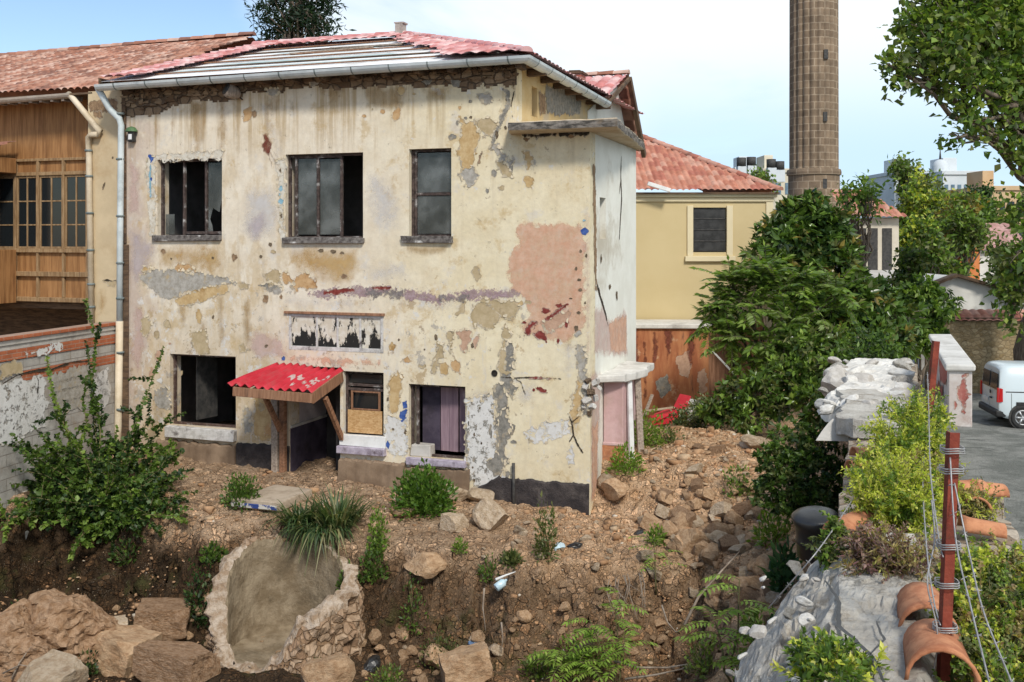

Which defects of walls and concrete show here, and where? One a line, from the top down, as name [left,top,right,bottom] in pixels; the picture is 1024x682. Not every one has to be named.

spalling [88,64,589,193]
crack [616,156,624,240]
spalling [139,249,317,356]
crack [597,283,608,323]
peeling [0,342,111,446]
peeling [384,267,602,487]
crack [569,416,583,453]
rust [636,330,672,362]
peeling [937,359,971,414]